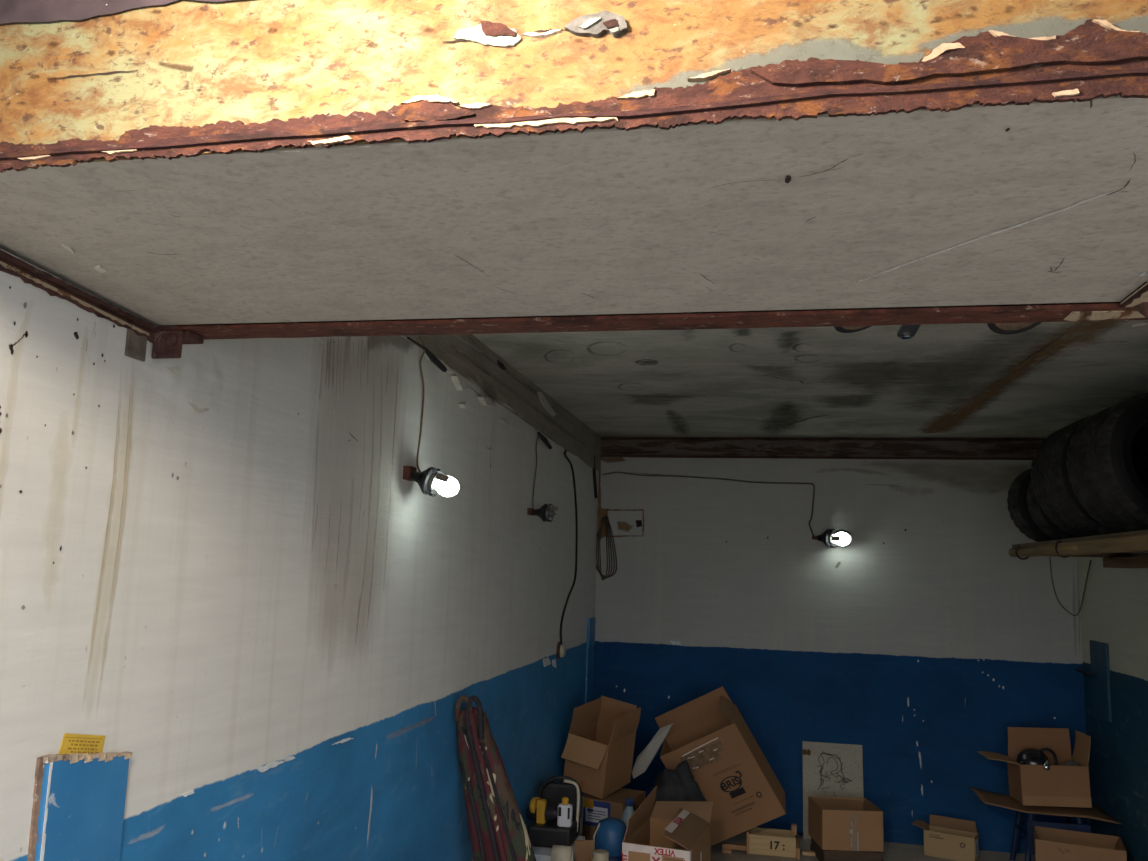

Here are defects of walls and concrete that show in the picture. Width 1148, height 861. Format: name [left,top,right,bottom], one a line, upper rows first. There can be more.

peeling [442,10,628,48]
peeling [617,15,1148,99]
peeling [401,94,492,110]
rust [0,19,1148,173]
peeling [308,135,353,148]
peeling [474,117,618,129]